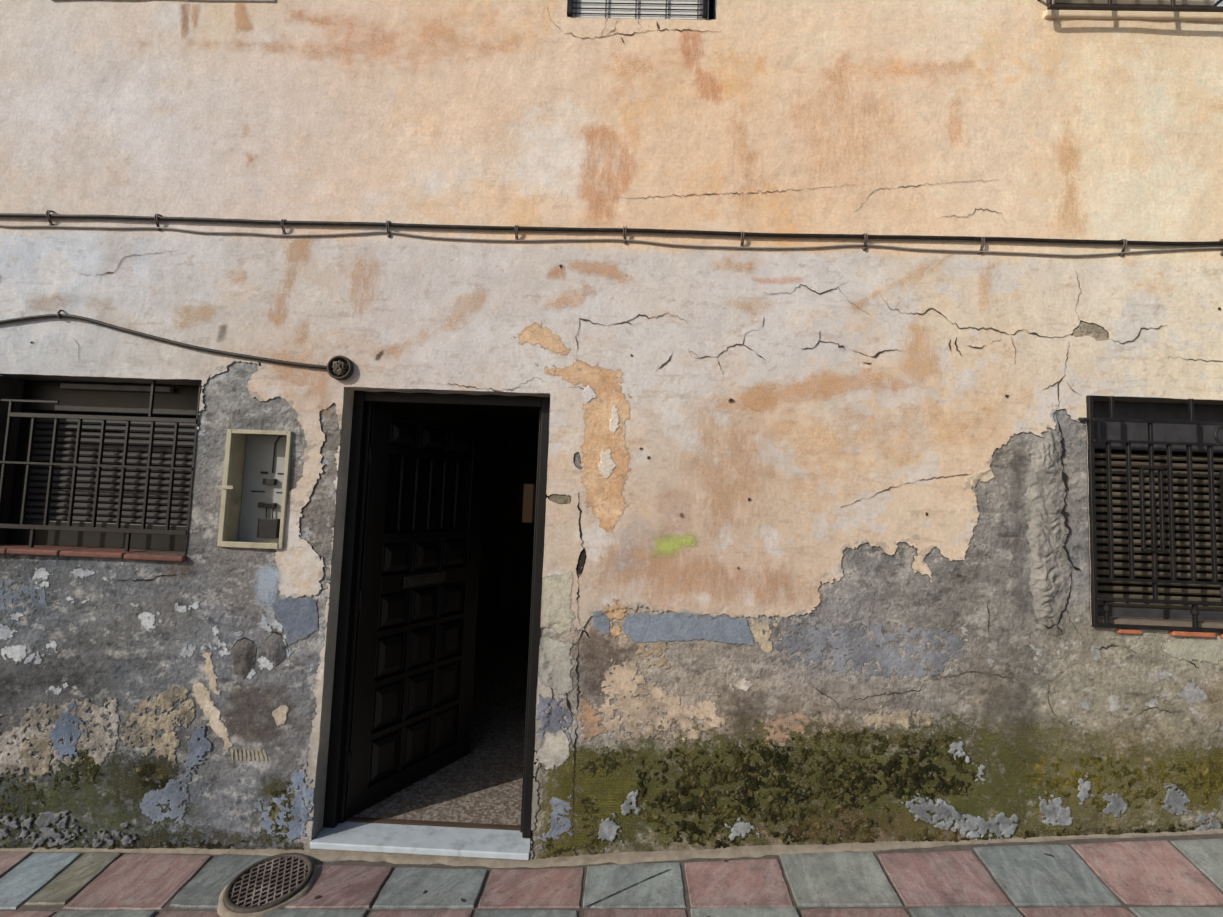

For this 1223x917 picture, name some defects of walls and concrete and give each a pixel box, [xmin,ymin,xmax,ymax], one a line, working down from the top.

crack [547,7,720,43]
crack [76,250,176,275]
flaking render [510,322,632,533]
crack [575,270,1136,653]
crack [1112,325,1166,344]
flaking render [0,361,341,849]
crack [566,581,590,844]
flaking render [530,409,1223,859]
water stain [0,810,142,850]